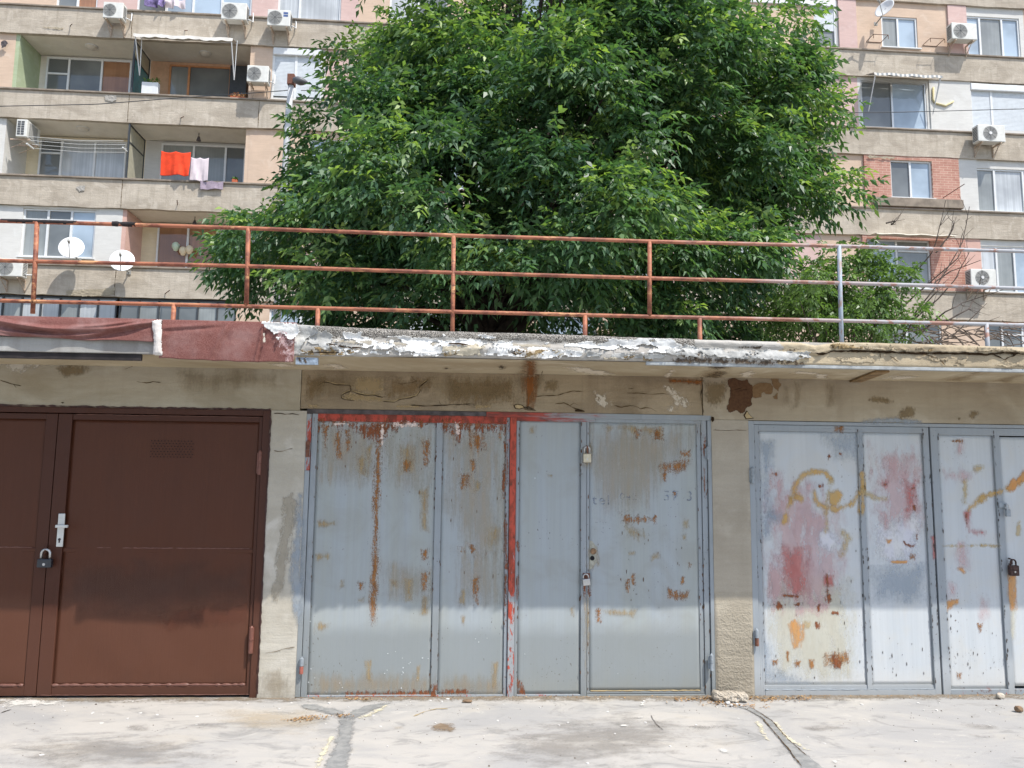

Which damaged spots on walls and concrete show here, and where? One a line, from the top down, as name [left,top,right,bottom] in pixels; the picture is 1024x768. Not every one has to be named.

peeling [261,321,811,369]
spalling [836,356,875,364]
crack [319,376,475,406]
corrosion [522,351,539,408]
crack [536,391,583,409]
crack [615,388,664,411]
flaking render [727,378,781,419]
corrosion [659,451,690,481]
corrosion [314,417,508,621]
corrosion [667,563,690,600]
corrosion [773,574,849,669]
corrosion [345,661,468,697]